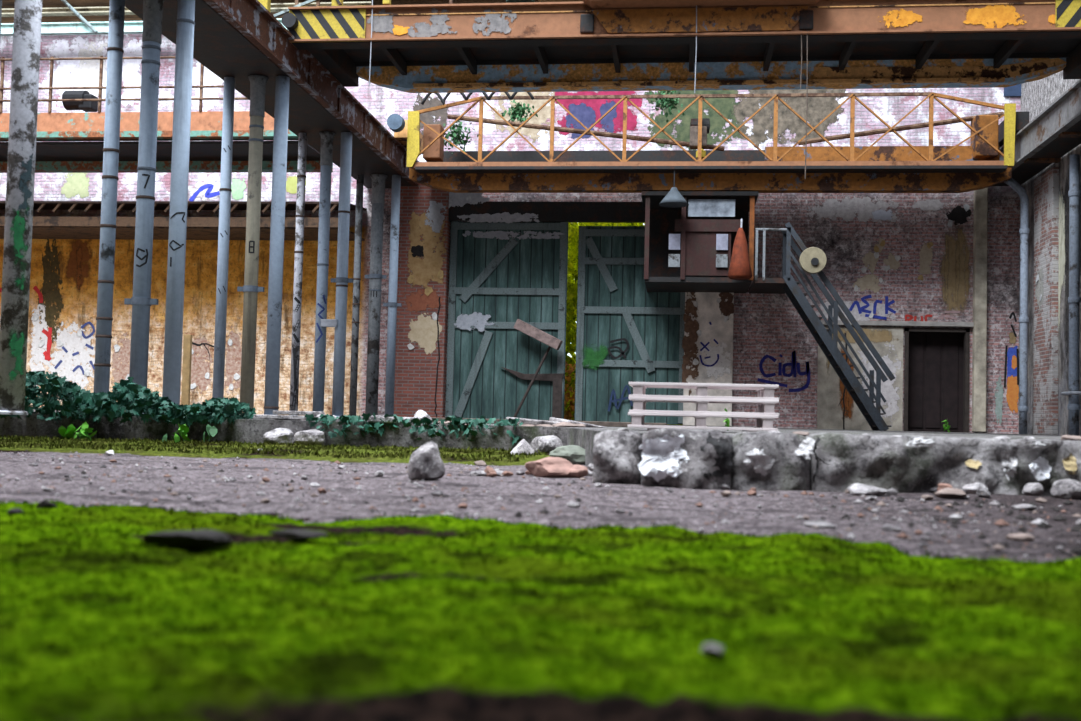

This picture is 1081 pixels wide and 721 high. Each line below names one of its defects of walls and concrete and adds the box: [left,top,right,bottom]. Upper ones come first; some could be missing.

corrosion [392,25,410,36]
corrosion [877,9,923,28]
corrosion [963,4,1027,28]
flaking render [402,192,564,354]
water stain [38,239,64,343]